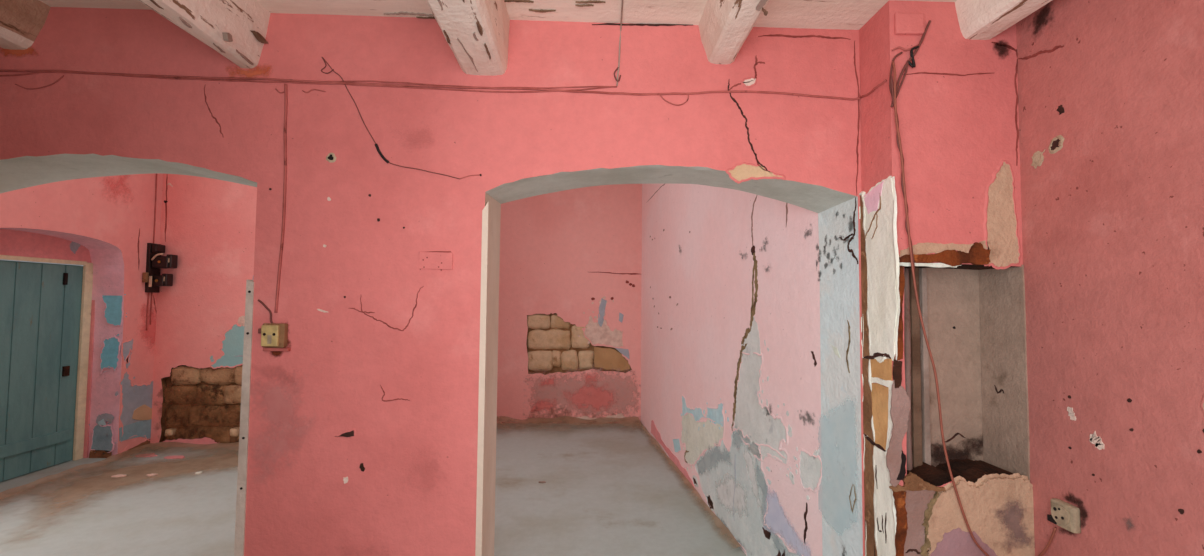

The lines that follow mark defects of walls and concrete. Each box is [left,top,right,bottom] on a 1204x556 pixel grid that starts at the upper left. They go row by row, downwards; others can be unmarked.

spalling [725,162,786,184]
spalling [1031,135,1065,169]
crack [728,34,860,431]
peeling [89,288,153,458]
peeling [210,316,245,369]
crack [349,251,451,331]
peeling [578,296,630,359]
flaking render [859,159,1057,556]
peeling [651,316,823,556]